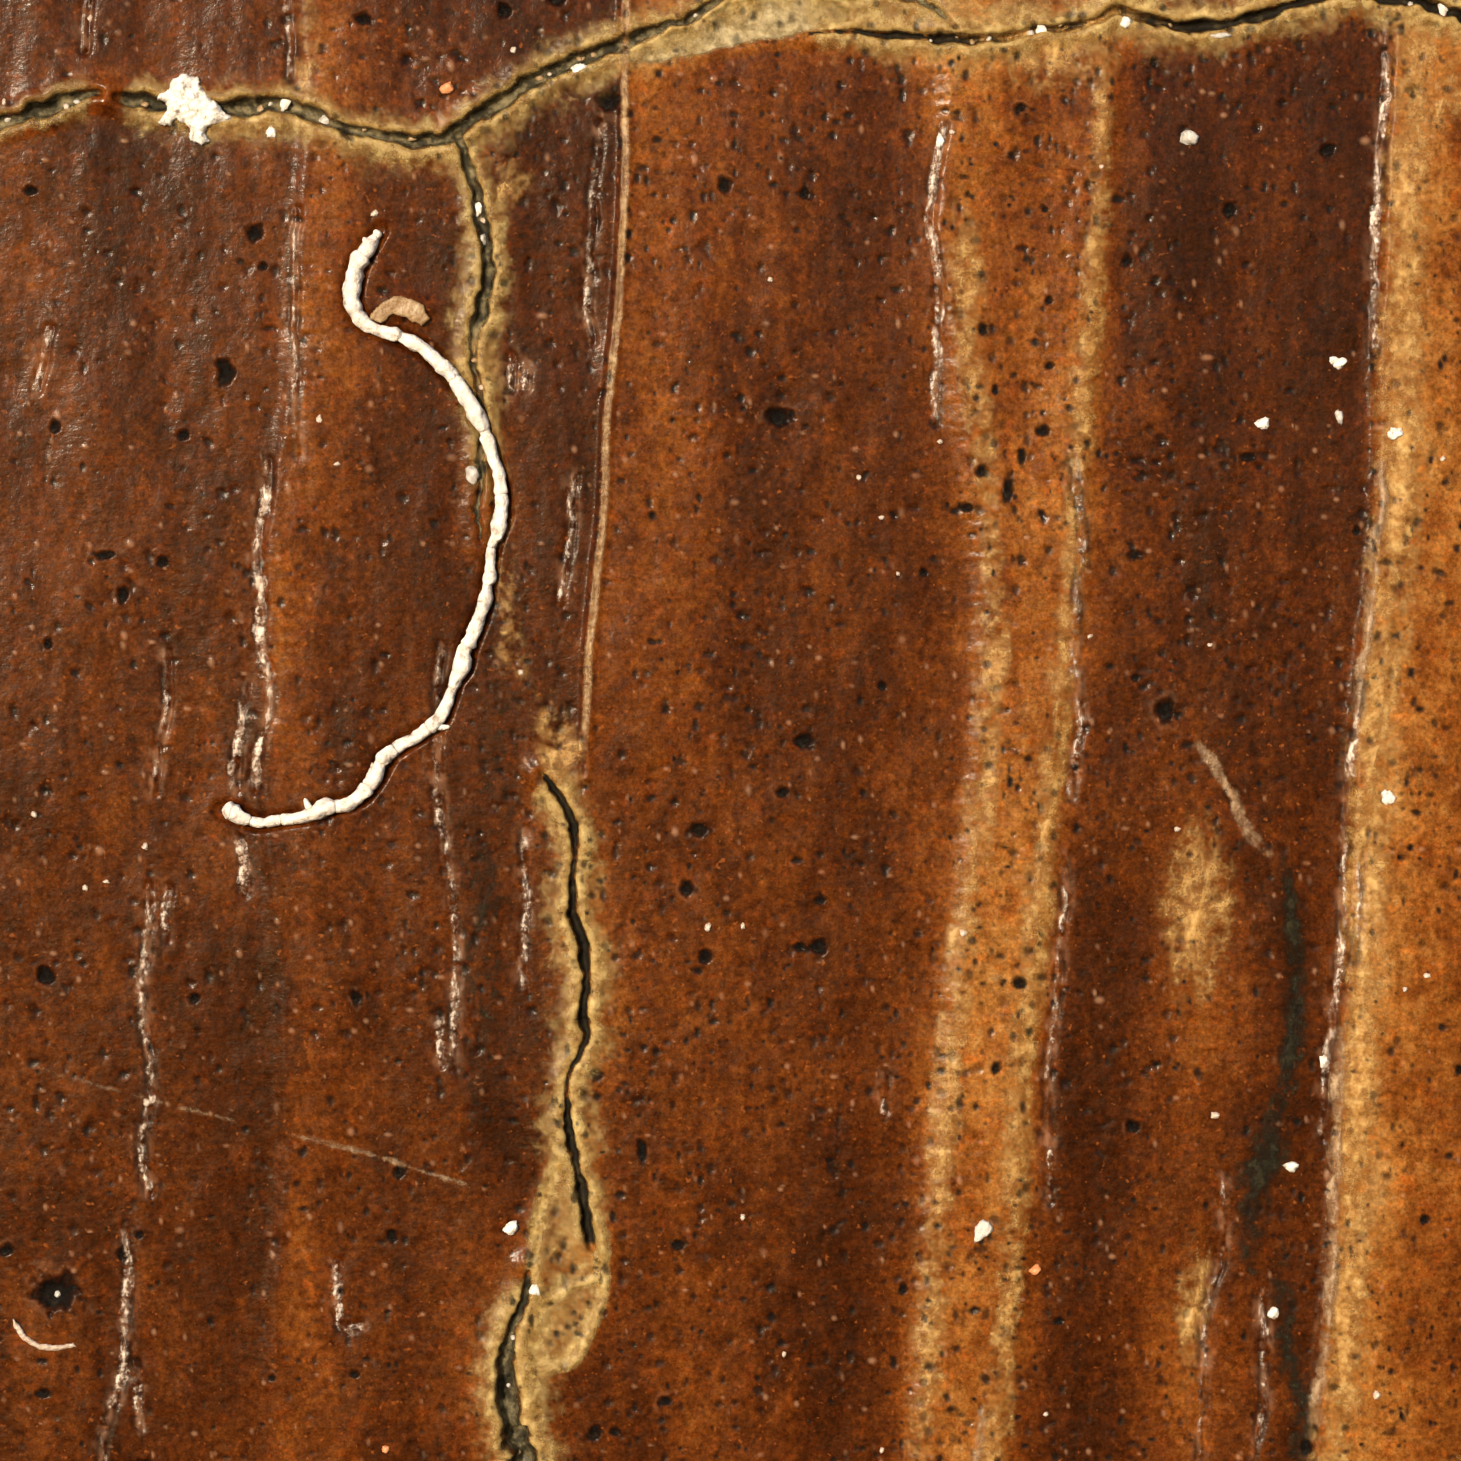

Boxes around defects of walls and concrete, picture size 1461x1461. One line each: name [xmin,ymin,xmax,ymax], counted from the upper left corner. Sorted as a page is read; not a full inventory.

crack [0,0,1461,731]
crack [485,772,610,1461]